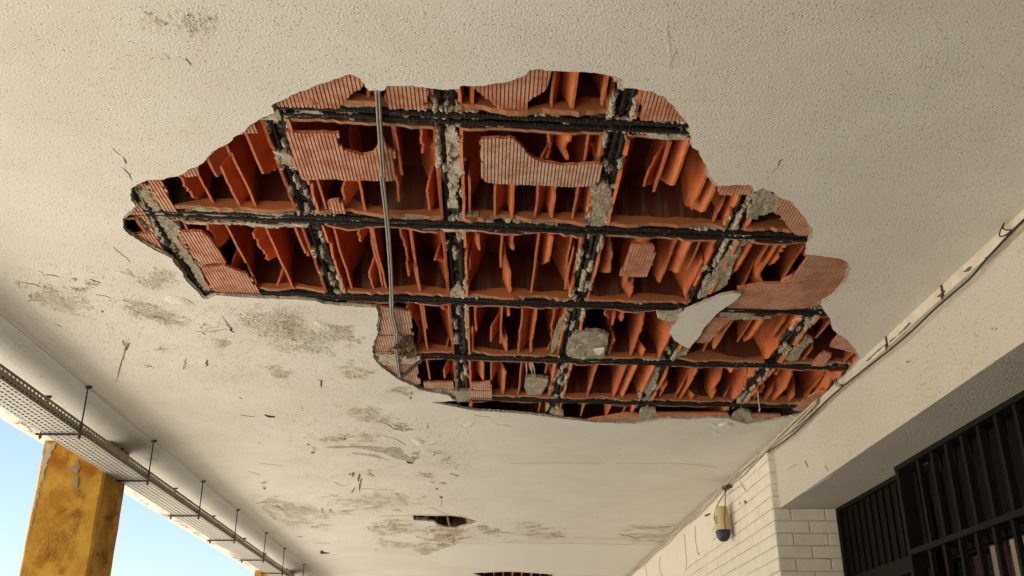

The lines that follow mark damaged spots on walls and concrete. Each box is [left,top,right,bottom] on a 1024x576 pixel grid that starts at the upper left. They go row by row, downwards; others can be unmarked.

spalling [278,296,388,370]
peeling [6,414,96,532]
peeling [420,535,660,576]